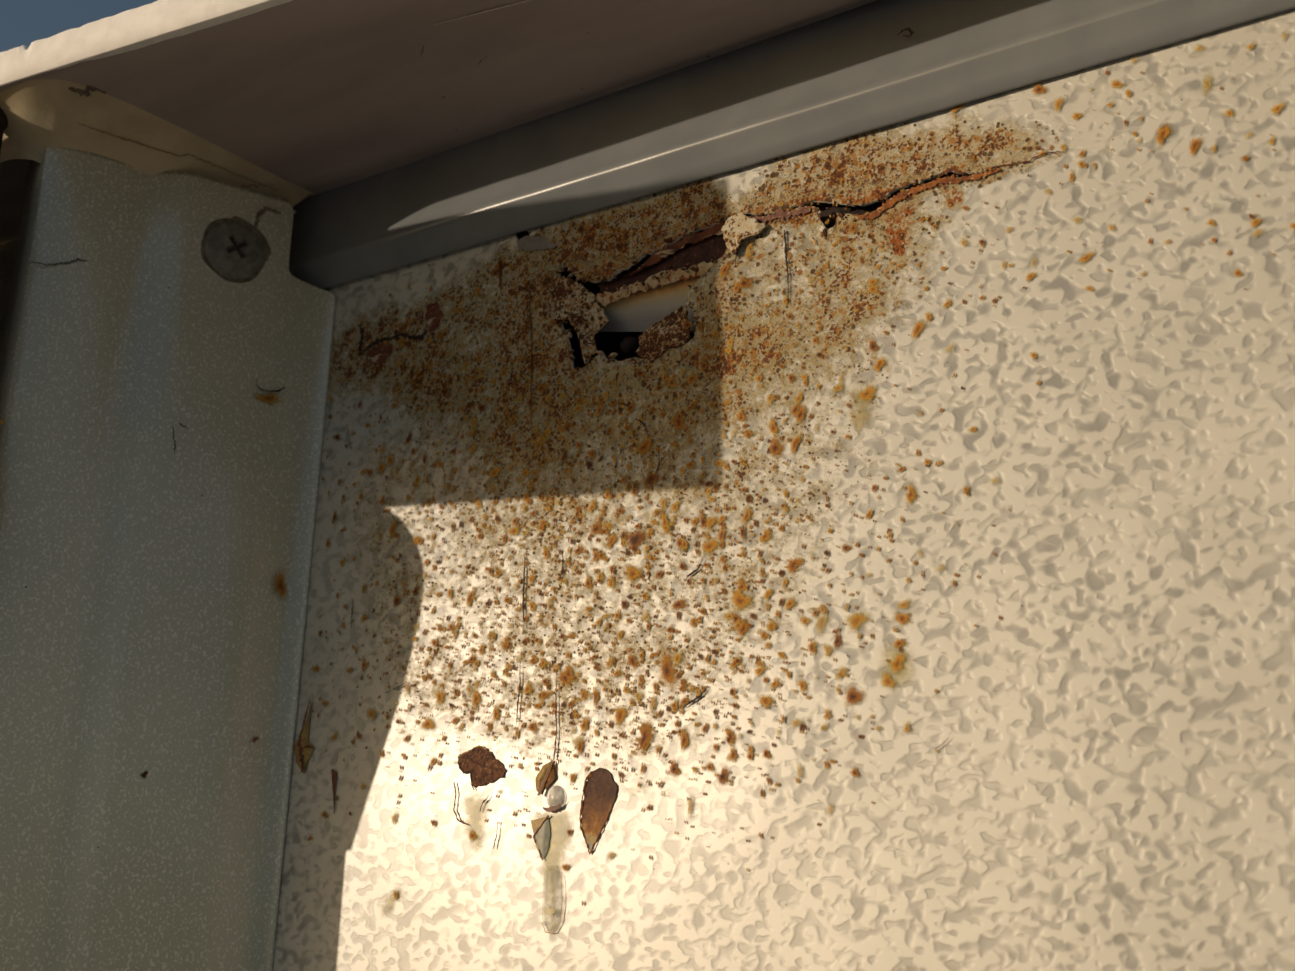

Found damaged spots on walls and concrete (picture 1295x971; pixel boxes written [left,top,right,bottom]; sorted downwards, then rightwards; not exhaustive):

corrosion [1190,138,1216,155]
crack [730,151,1063,304]
corrosion [1249,214,1262,237]
spalling [561,268,602,295]
spalling [563,320,657,368]
corrosion [311,84,1170,840]
peeling [294,700,314,774]
spalling [458,745,506,790]
peeling [536,760,555,796]
spalling [579,768,617,855]
peeling [531,815,550,860]